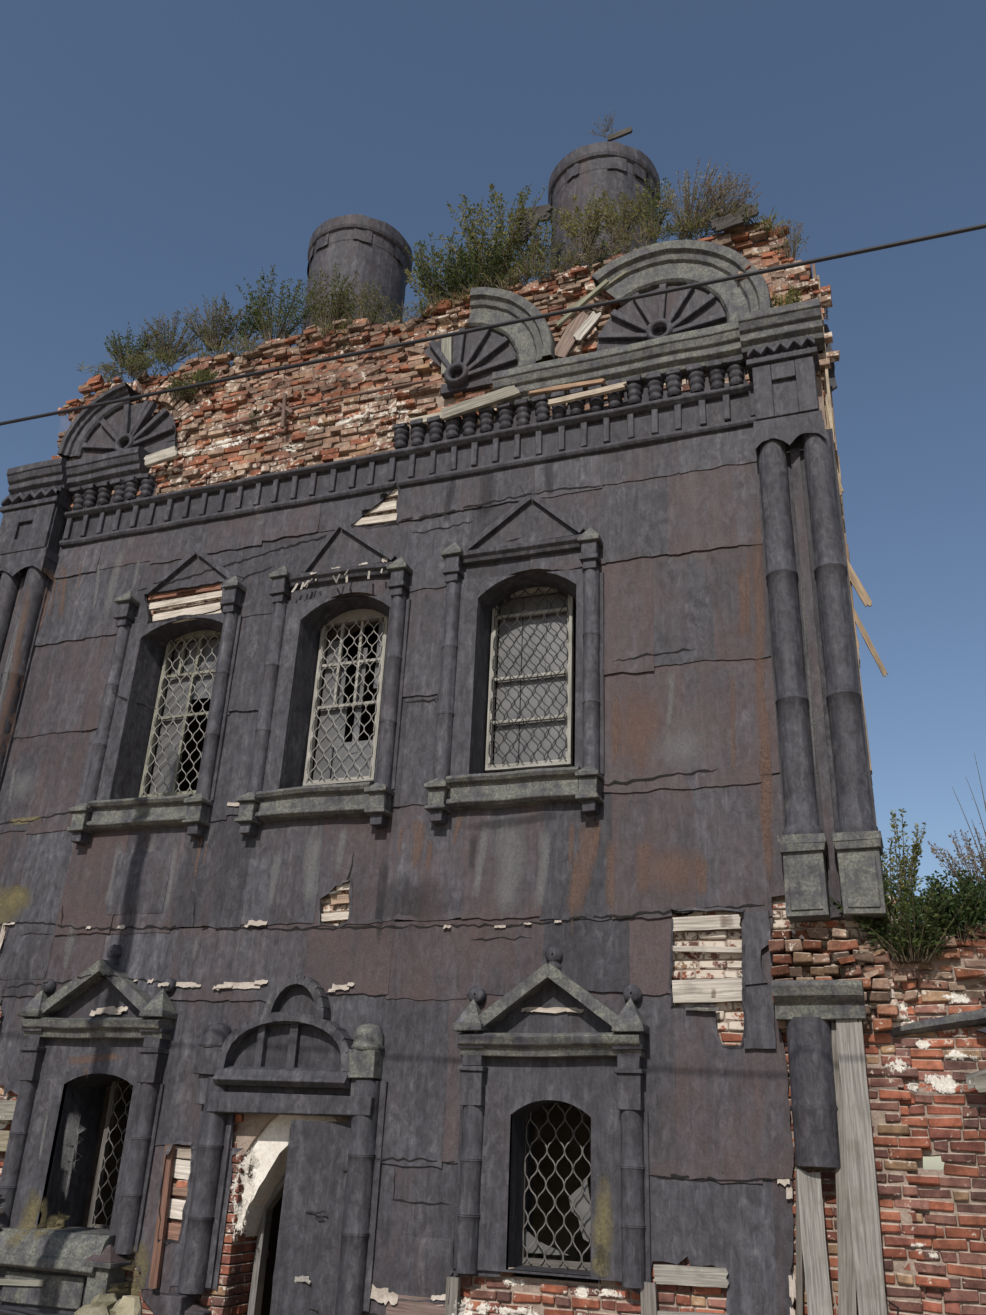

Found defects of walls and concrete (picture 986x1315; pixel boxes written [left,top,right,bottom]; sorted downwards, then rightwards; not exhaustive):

peeling [178,408,409,458]
peeling [350,481,400,529]
crack [401,485,604,533]
peeling [146,578,229,624]
crack [612,648,697,662]
crack [603,768,718,786]
peeling [319,878,352,928]
crack [0,904,762,941]
peeling [668,907,747,1049]
peeling [230,1148,259,1239]
peeling [777,1178,793,1199]